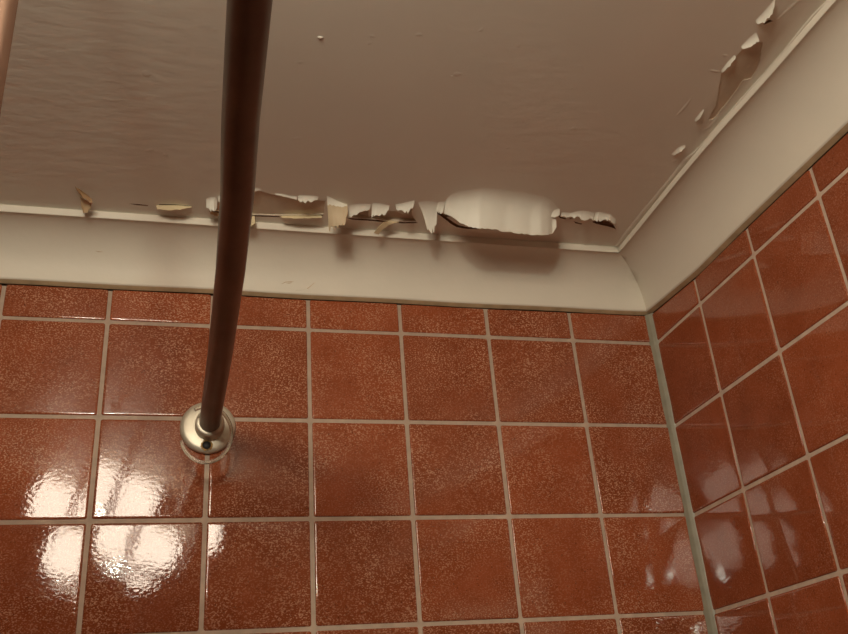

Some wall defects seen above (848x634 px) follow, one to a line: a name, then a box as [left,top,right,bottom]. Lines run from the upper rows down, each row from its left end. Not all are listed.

peeling [694,0,775,121]
peeling [206,196,220,211]
peeling [252,188,617,235]